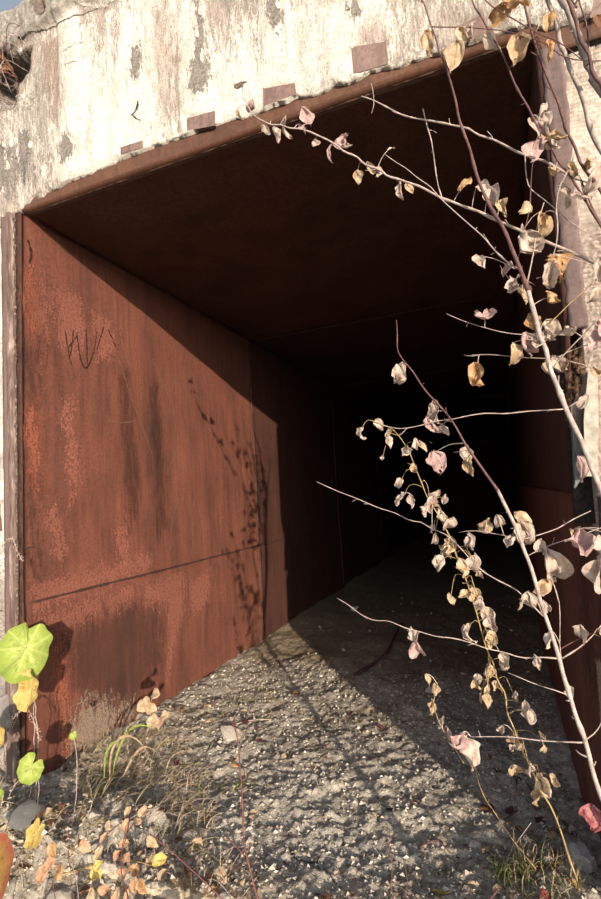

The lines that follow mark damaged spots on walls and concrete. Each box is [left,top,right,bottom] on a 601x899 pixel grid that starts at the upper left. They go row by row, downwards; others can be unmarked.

crack [17,8,98,40]
spalling [0,48,35,114]
peeling [0,127,34,204]
rust [18,256,43,351]
rust [23,395,45,495]
rust [51,635,75,767]